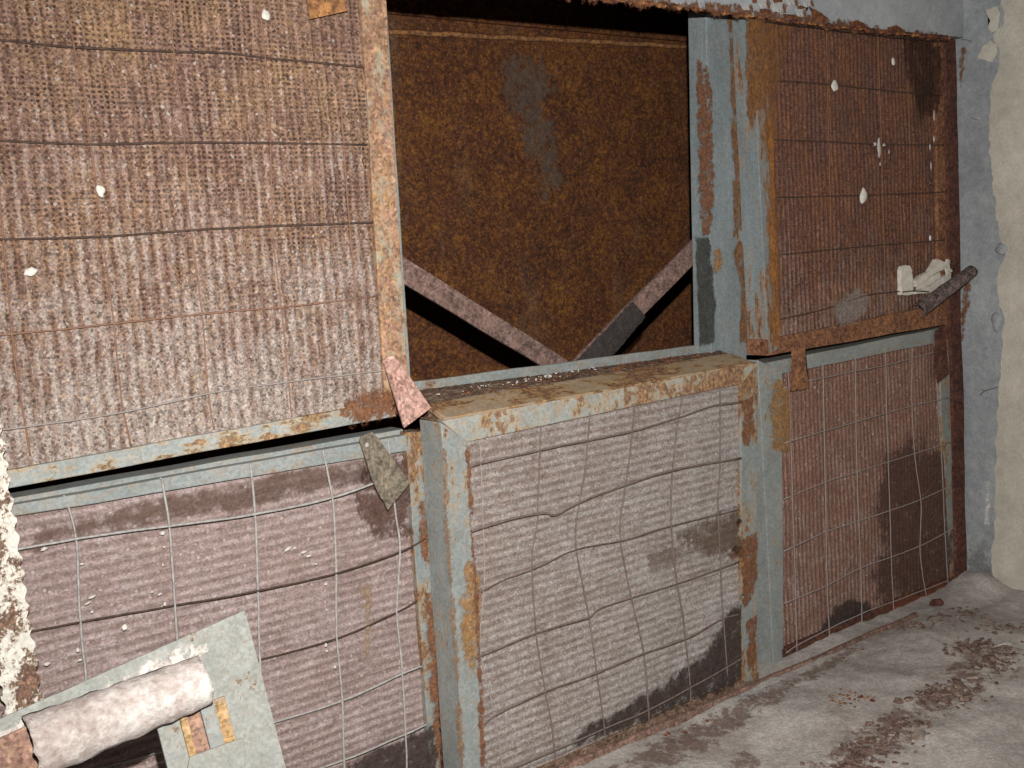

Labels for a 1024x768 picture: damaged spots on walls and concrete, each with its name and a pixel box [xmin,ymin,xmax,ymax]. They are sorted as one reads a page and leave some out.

spalling [601,0,703,11]
peeling [718,0,951,40]
leakage [904,35,944,121]
corrosion [589,0,889,346]
flaking render [977,0,1024,591]
corrosion [340,389,398,423]
corrosion [742,396,755,446]
corrosion [771,380,791,451]
leakage [33,454,422,552]
leakage [819,438,953,632]
leakage [575,594,769,746]